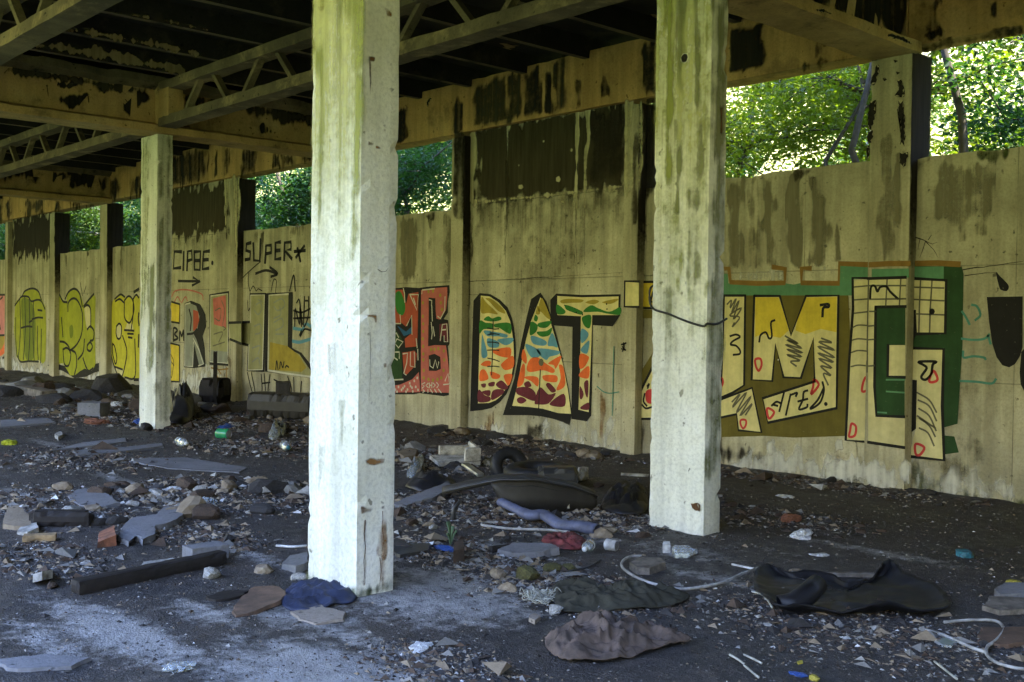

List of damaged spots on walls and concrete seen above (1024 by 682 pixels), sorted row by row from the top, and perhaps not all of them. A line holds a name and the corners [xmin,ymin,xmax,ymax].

peeling [36,28,199,75]
leakage [339,0,364,244]
leakage [400,55,591,304]
leakage [601,0,840,362]
leakage [877,135,901,260]
leakage [935,163,996,239]
leakage [705,377,721,478]
leakage [733,440,919,488]
leakage [941,466,1012,498]